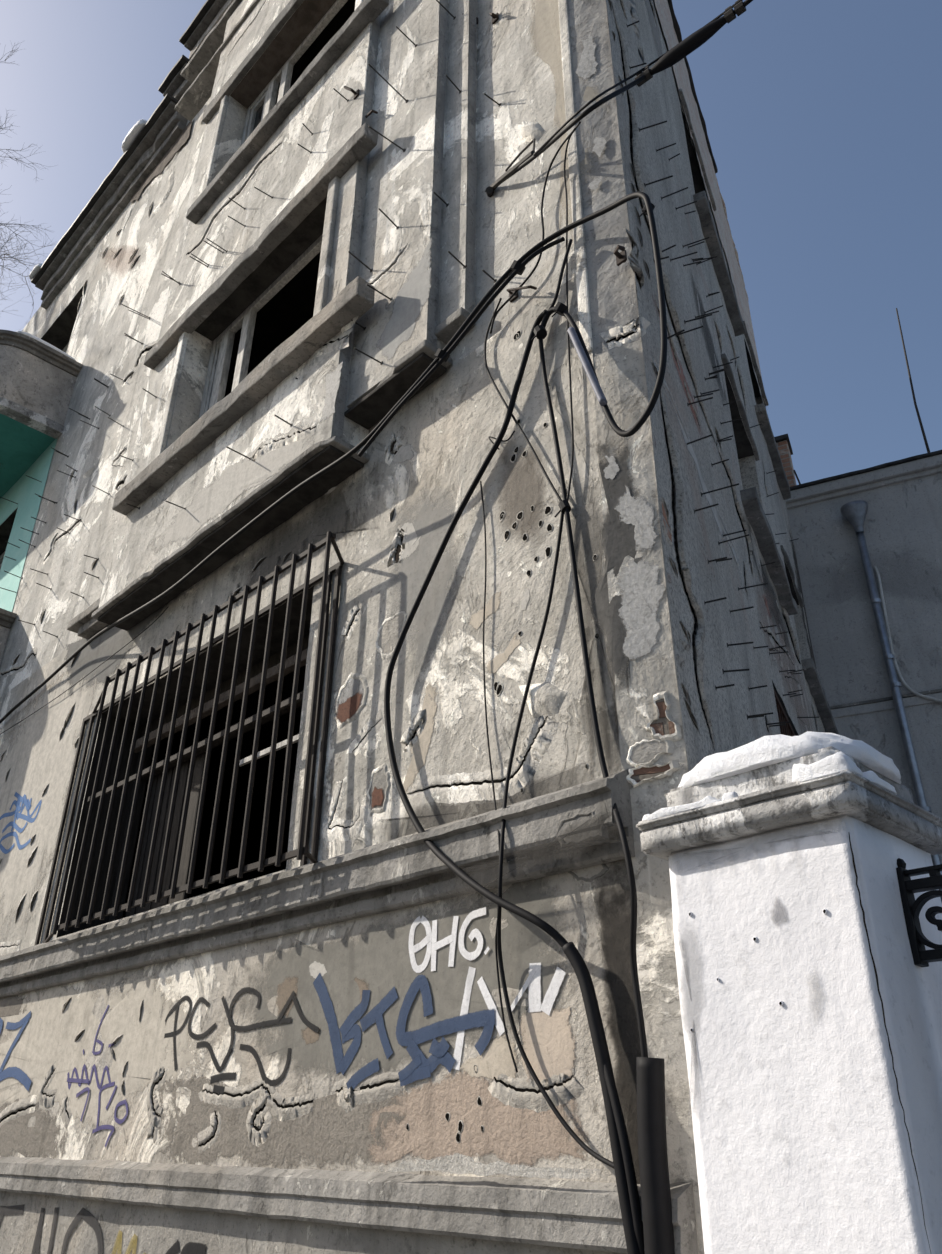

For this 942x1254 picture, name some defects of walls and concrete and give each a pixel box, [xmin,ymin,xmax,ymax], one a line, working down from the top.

crack [599,0,818,751]
peeling [604,455,678,660]
rust [336,693,362,723]
crack [322,709,426,842]
crack [407,716,559,809]
spalling [626,621,700,788]
crack [0,1061,72,1129]
peeling [0,878,602,1179]
crack [487,1064,585,1113]